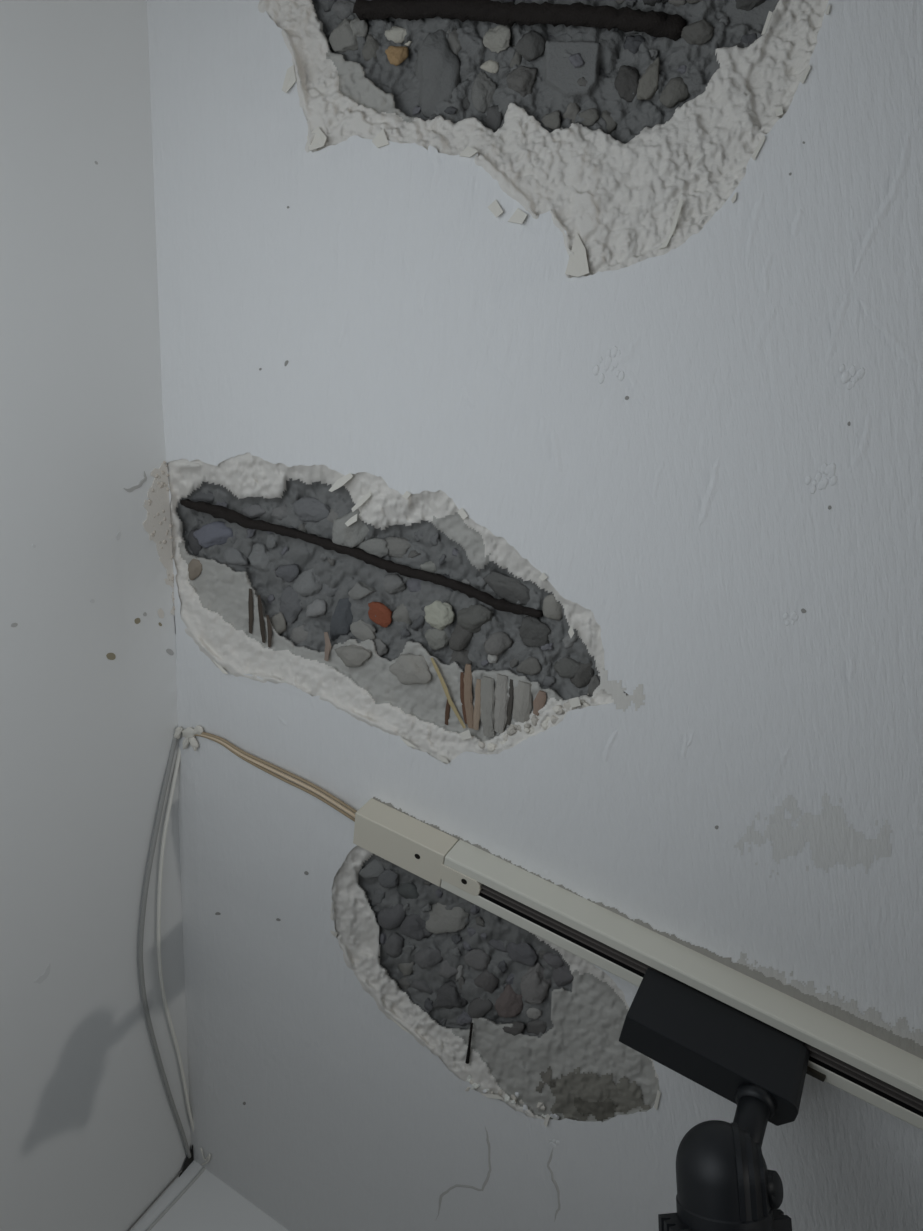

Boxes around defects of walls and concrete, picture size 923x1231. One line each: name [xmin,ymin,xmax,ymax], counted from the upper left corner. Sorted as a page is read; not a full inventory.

spalling [258,0,830,278]
spalling [124,453,628,764]
spalling [330,845,661,1127]